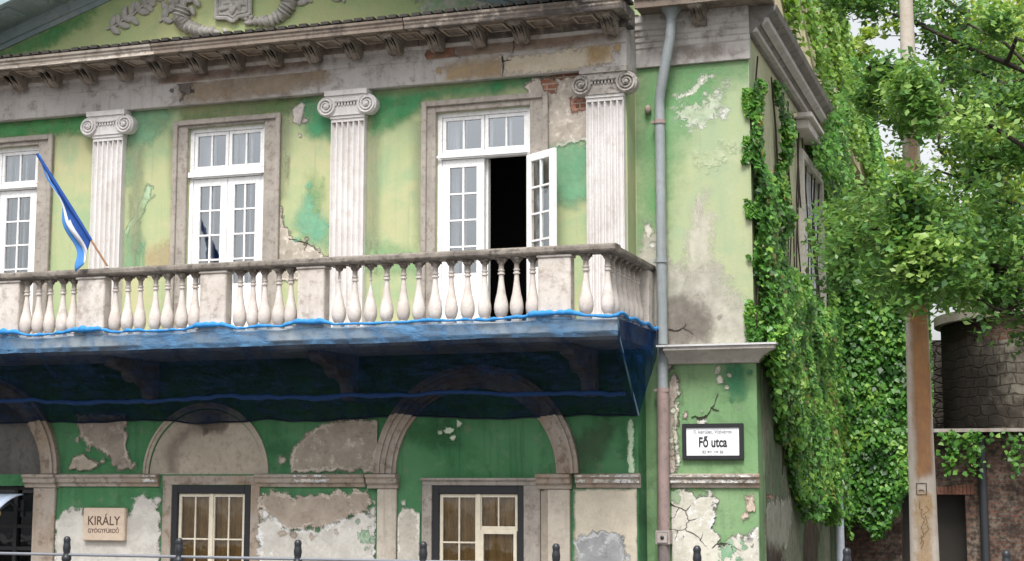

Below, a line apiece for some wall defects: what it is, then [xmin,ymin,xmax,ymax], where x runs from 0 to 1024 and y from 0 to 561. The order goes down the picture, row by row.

spalling [524,73,586,148]
peeling [670,73,730,132]
water stain [685,196,716,279]
corrosion [910,305,932,476]
spalling [54,413,161,561]
spalling [256,418,377,561]
spalling [574,475,639,561]
crack [670,503,737,555]
spalling [668,365,793,561]
corrosion [917,495,932,561]